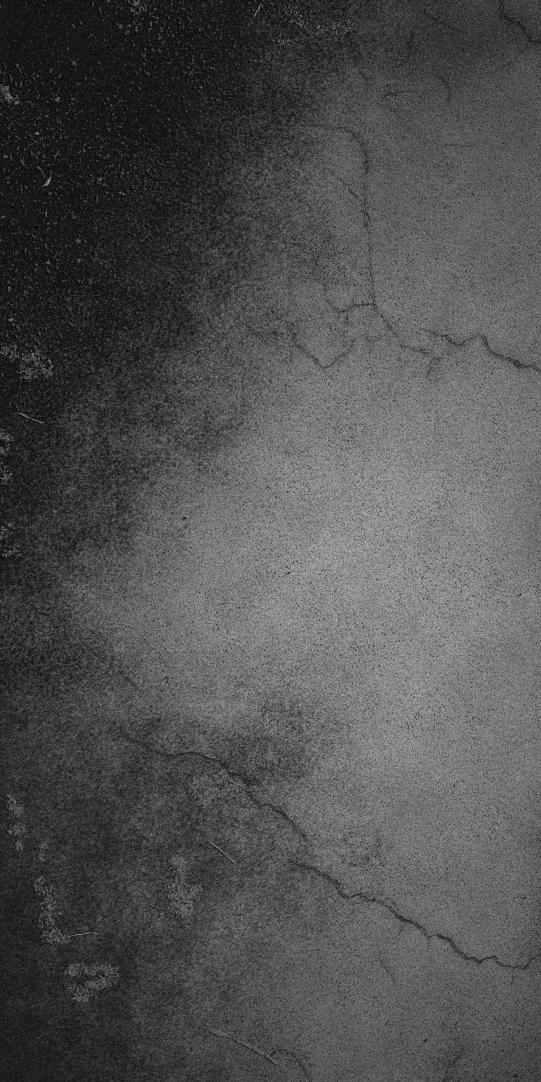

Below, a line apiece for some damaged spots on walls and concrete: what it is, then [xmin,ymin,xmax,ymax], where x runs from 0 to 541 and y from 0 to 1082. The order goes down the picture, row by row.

crack [251,127,541,379]
crack [128,737,541,985]